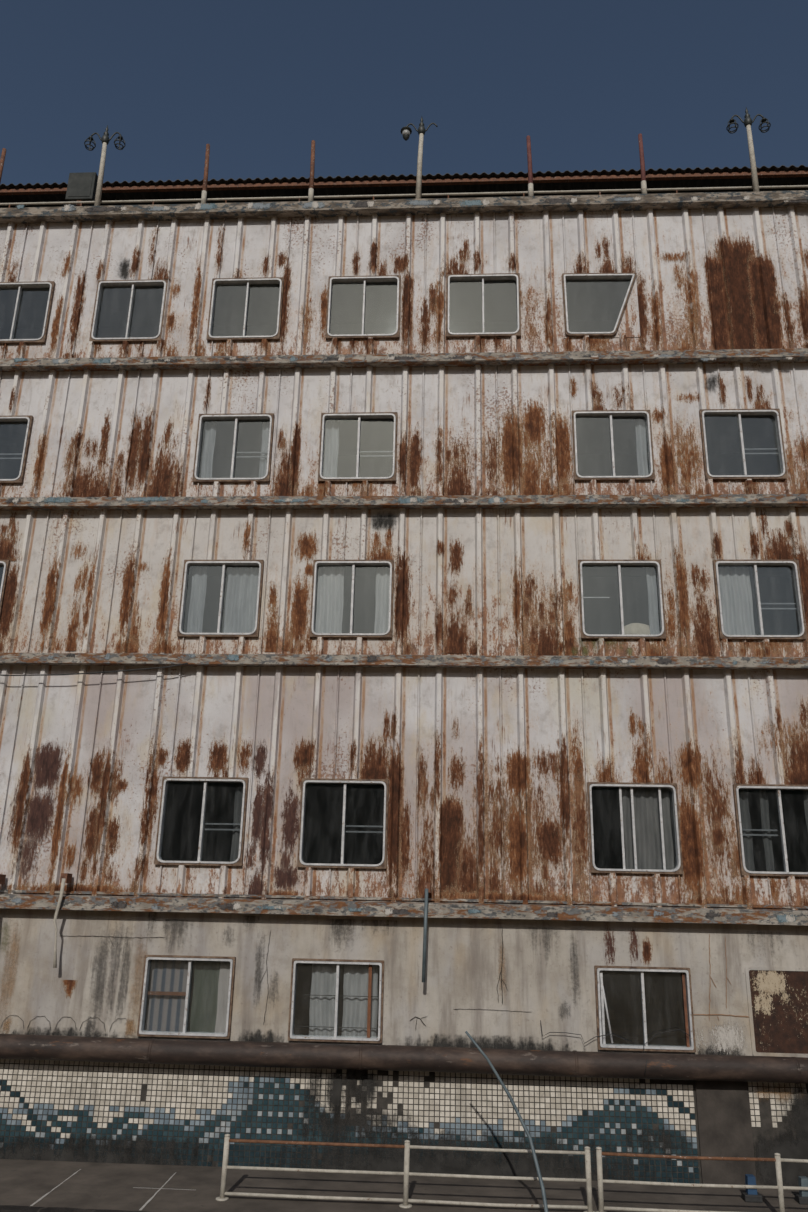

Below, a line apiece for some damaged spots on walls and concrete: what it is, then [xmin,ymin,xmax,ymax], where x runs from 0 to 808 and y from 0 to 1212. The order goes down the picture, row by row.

corrosion [520,232,808,409]
corrosion [59,408,184,497]
corrosion [397,395,574,496]
corrosion [591,381,631,410]
corrosion [786,436,808,493]
corrosion [7,736,316,899]
corrosion [348,709,617,905]
corrosion [630,698,808,908]
damp [13,937,133,1038]
corrosion [642,938,652,964]
peeling [695,970,808,1054]